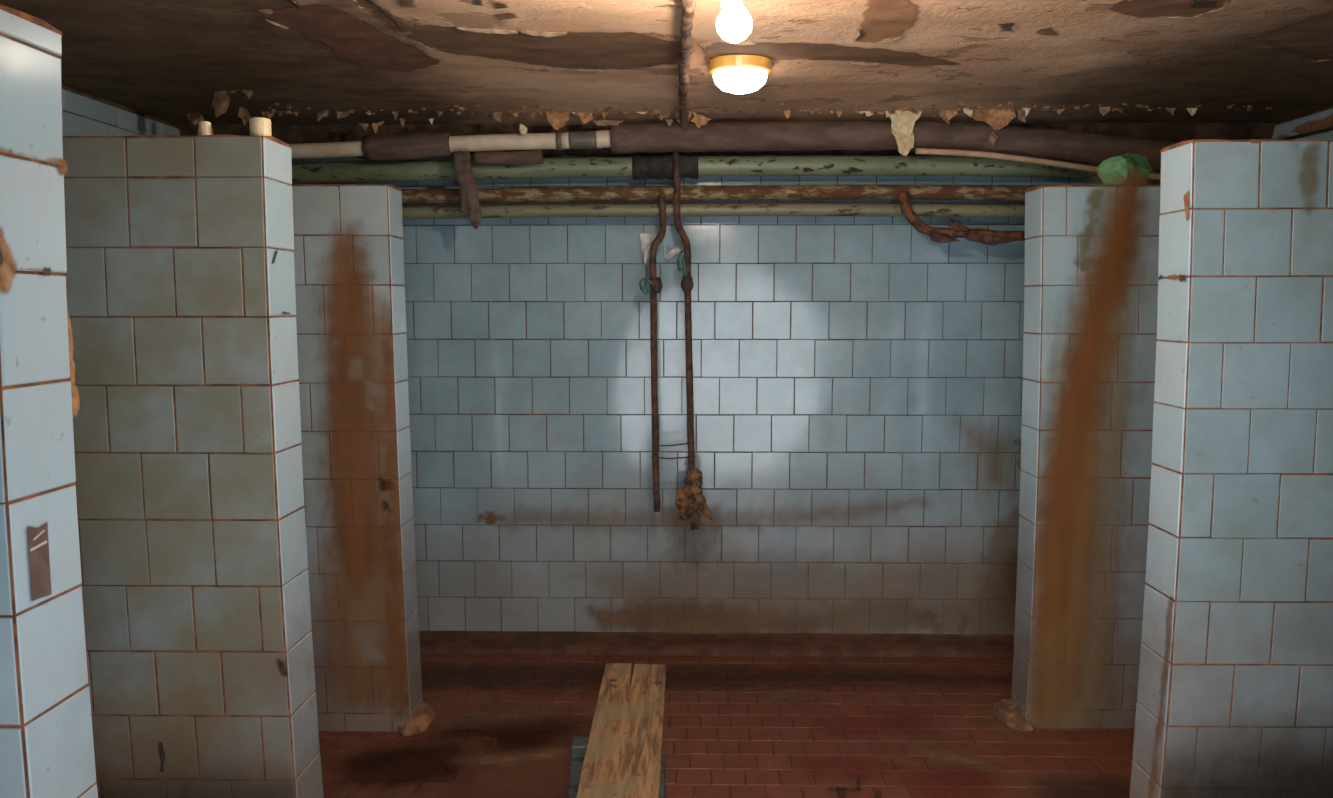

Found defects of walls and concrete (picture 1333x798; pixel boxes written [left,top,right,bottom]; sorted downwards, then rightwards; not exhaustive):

peeling [1110,0,1231,18]
peeling [257,0,959,71]
spalling [1038,28,1057,36]
peeling [187,90,253,126]
peeling [324,112,405,134]
peeling [546,112,624,130]
peeling [656,111,711,128]
peeling [865,111,922,156]
peeling [971,109,1026,145]
corrosion [329,235,407,707]
corrosion [1036,190,1138,729]
water stain [595,603,820,634]